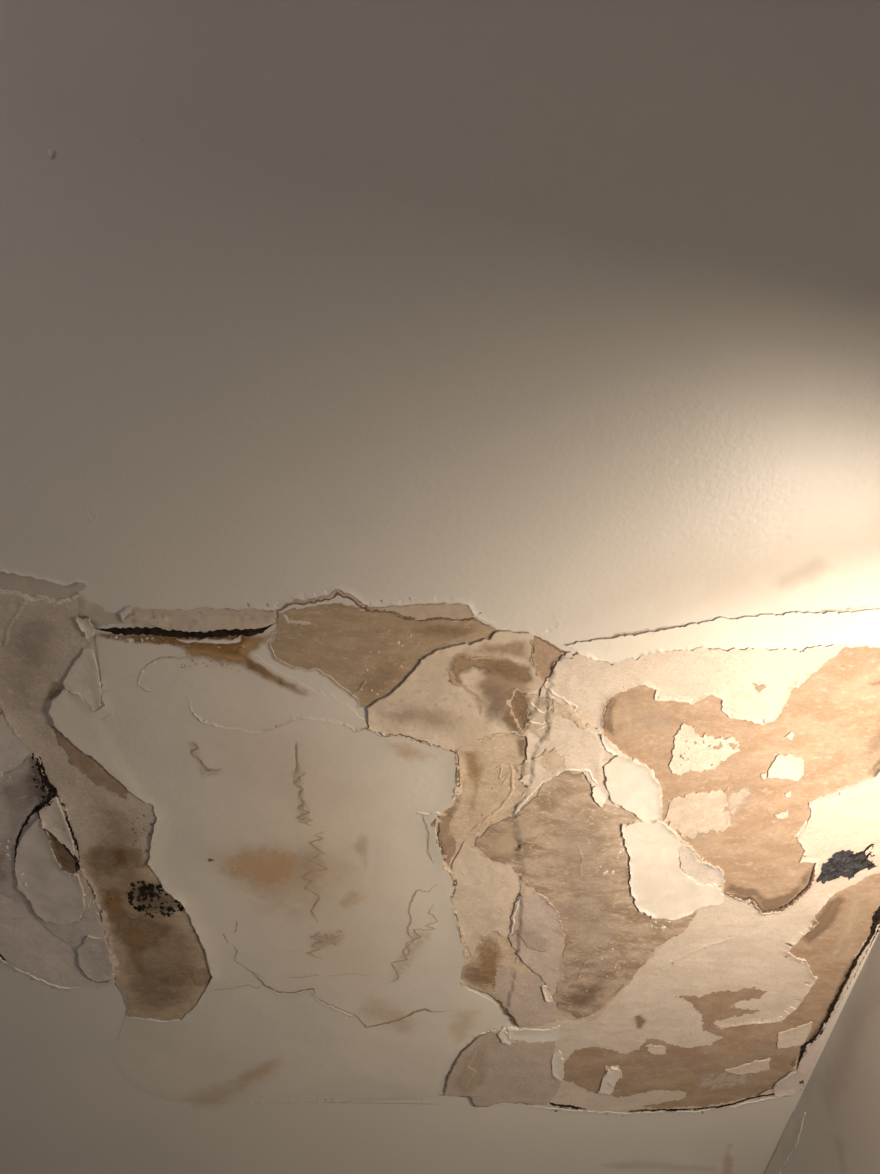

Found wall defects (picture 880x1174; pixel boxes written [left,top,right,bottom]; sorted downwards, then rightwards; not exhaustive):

crack [75,582,501,692]
crack [185,697,383,737]
crack [14,753,105,921]
mould [126,881,184,918]
leakage [294,743,345,958]
peeling [0,566,880,1113]
mould [817,843,876,884]
crack [0,954,117,992]